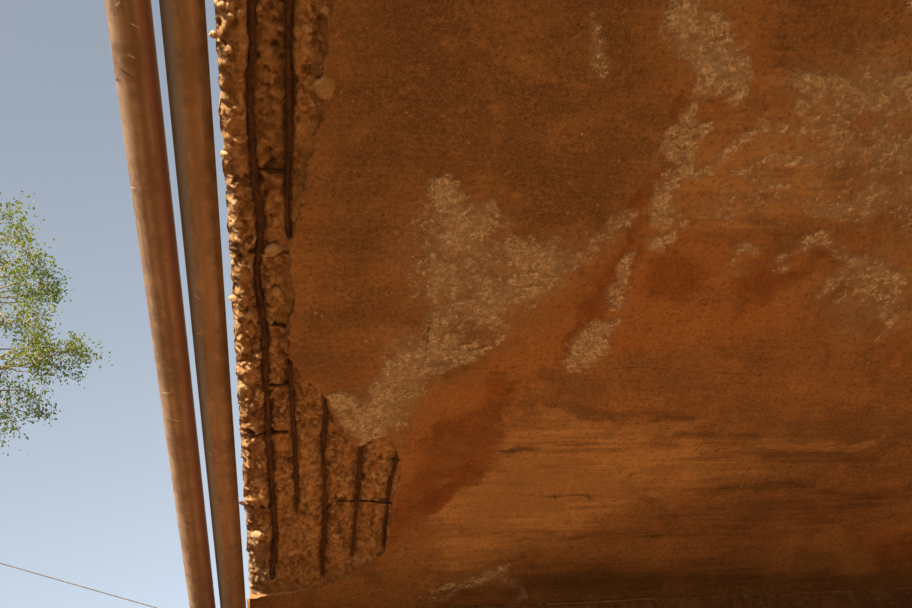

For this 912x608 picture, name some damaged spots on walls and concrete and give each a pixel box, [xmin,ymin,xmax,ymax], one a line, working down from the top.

spalling [209,0,401,595]
water stain [325,0,912,445]